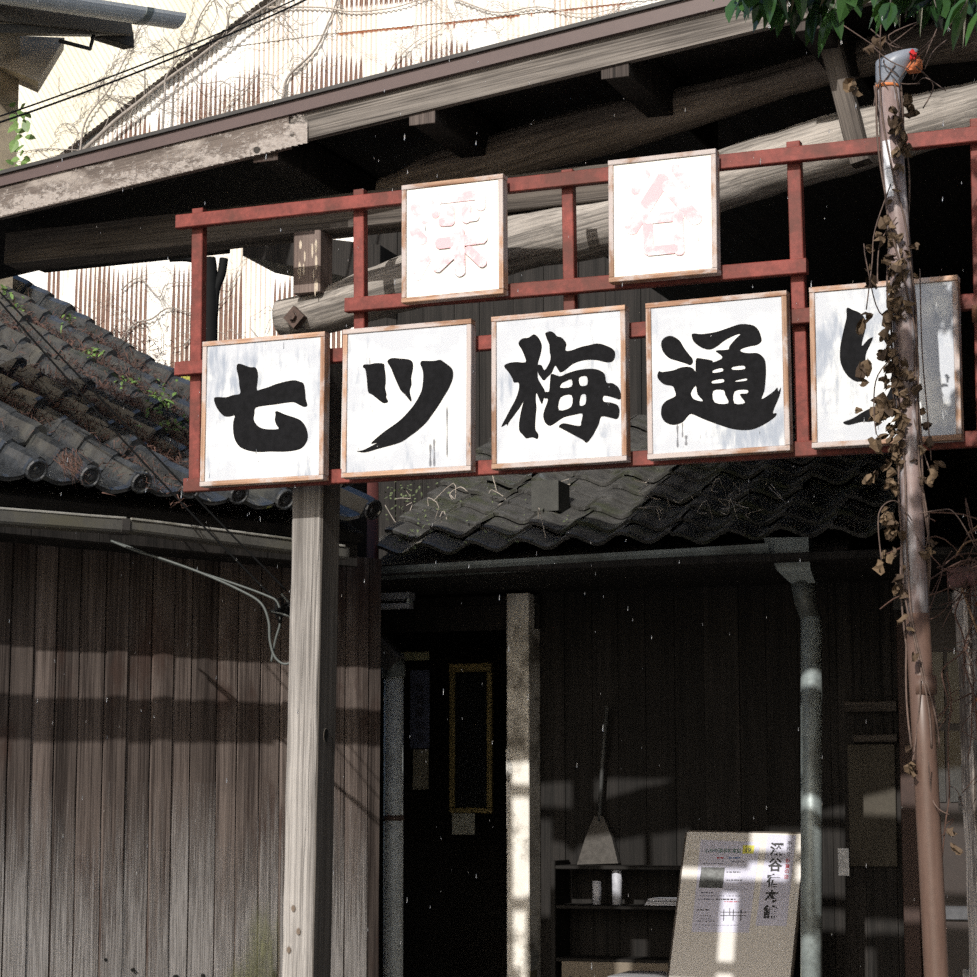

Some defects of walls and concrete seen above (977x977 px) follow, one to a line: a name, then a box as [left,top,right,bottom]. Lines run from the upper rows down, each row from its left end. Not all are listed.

corrosion [340,0,418,10]
corrosion [180,69,260,124]
corrosion [291,55,363,96]
corrosion [116,112,160,141]
corrosion [75,266,147,354]
corrosion [170,268,191,367]
corrosion [219,273,242,340]
corrosion [274,278,296,302]
corrosion [329,328,351,348]
water stain [0,828,283,977]